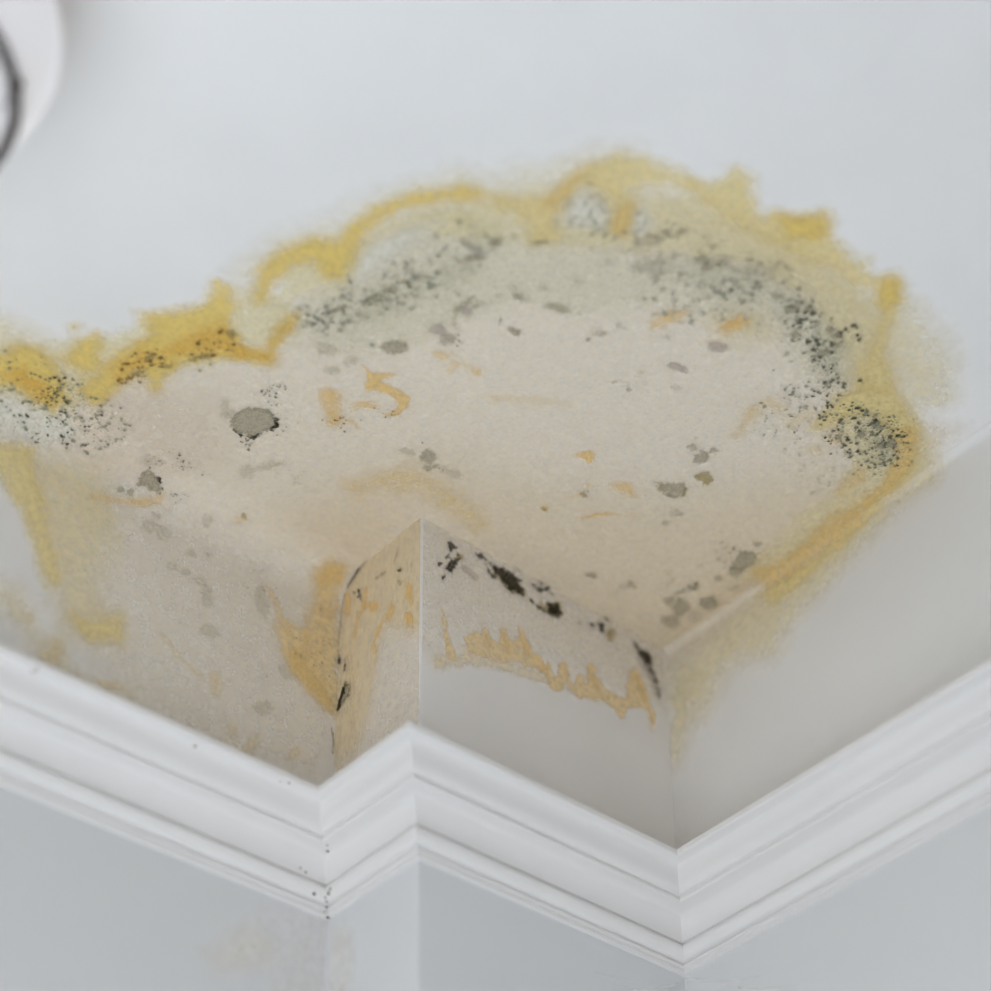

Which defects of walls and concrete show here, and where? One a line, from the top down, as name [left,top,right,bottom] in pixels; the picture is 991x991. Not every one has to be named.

leakage [0,158,930,752]